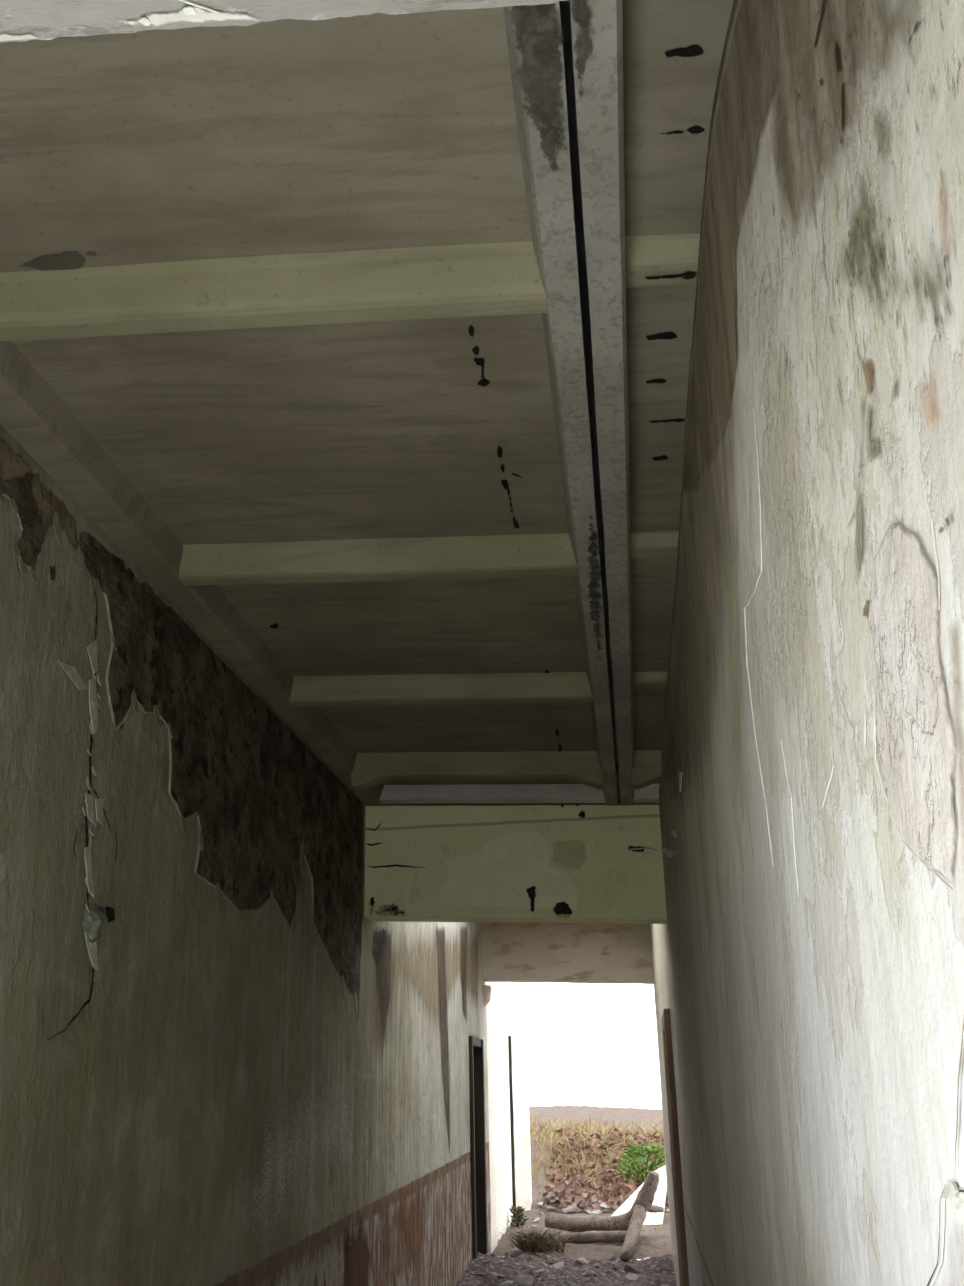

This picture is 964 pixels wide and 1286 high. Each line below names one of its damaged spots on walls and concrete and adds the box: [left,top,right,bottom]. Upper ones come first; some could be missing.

peeling [0,33,38,41]
peeling [127,6,257,26]
water stain [509,0,593,171]
water stain [837,187,949,336]
water stain [669,0,899,783]
crack [46,566,117,1041]
flaking render [0,438,363,1019]
crack [927,1019,964,1286]
peeling [275,1245,345,1286]